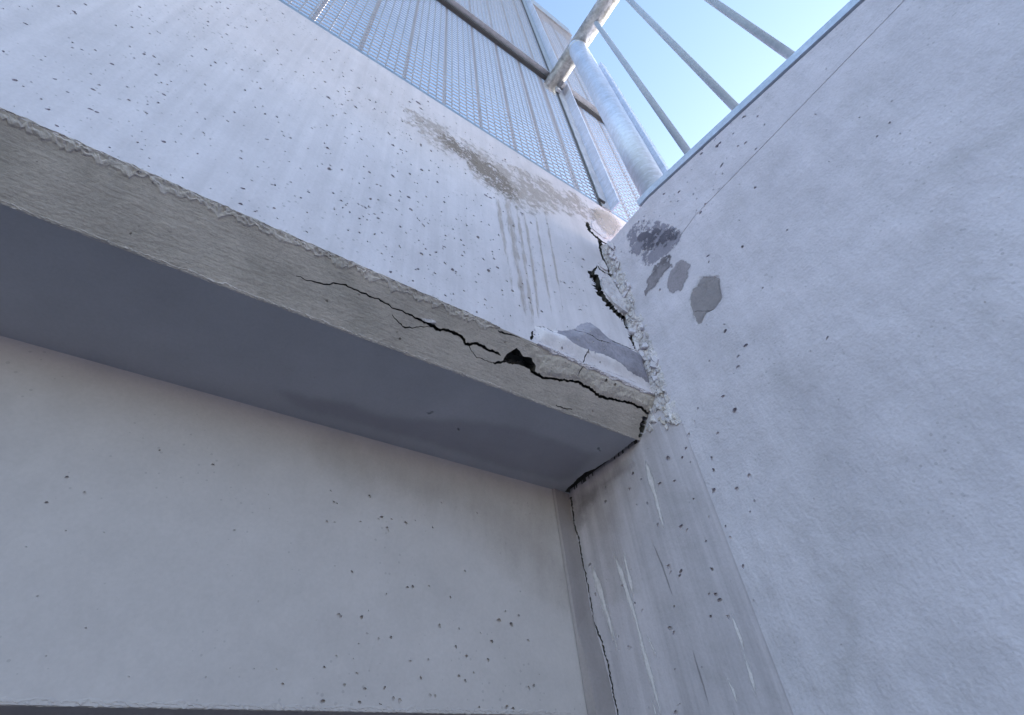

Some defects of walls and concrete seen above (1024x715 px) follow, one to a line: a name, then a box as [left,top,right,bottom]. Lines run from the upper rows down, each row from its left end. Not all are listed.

crack [297,222,649,715]
spalling [504,218,722,433]